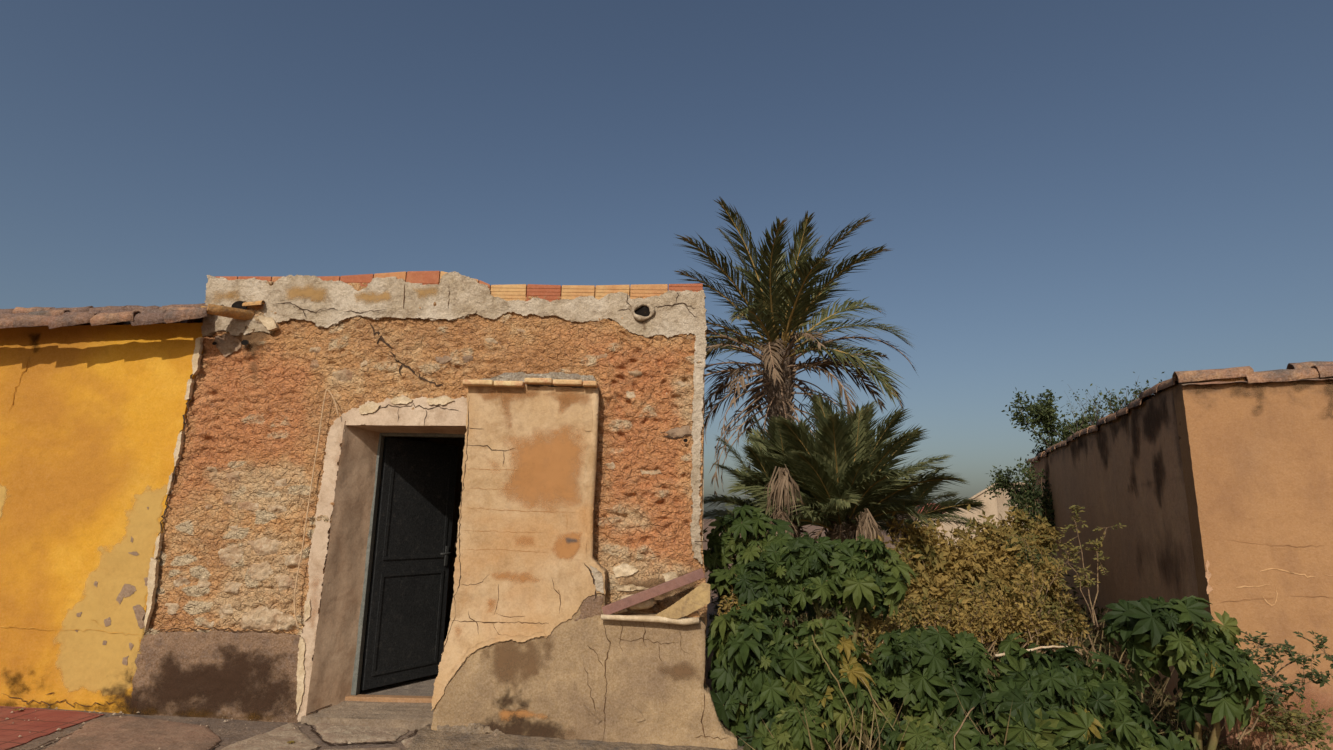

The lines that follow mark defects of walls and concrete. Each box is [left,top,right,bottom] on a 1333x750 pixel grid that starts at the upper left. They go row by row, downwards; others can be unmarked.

peeling [268,303,477,328]
crack [620,292,696,317]
peeling [185,337,204,400]
water stain [1070,401,1167,464]
crack [272,284,579,654]
water stain [1154,456,1163,499]
peeling [56,431,311,713]
water stain [107,646,296,721]
peeling [447,631,546,682]
crack [583,563,687,741]